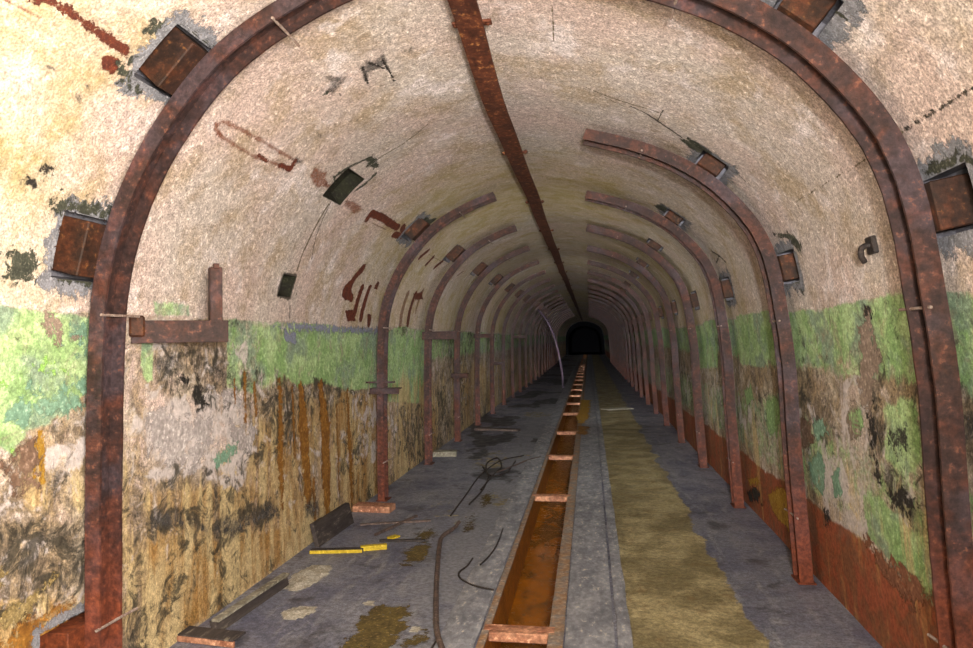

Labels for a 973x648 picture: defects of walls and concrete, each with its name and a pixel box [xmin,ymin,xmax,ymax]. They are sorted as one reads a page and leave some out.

rust [6,0,130,75]
spalling [109,8,223,105]
spalling [817,0,867,50]
crack [900,86,973,134]
crack [796,159,866,203]
spalling [917,133,973,186]
spalling [0,188,114,302]
spalling [937,229,973,265]
peeling [0,310,88,498]
rust [233,370,259,425]
rust [276,378,354,521]
leakage [866,399,919,527]